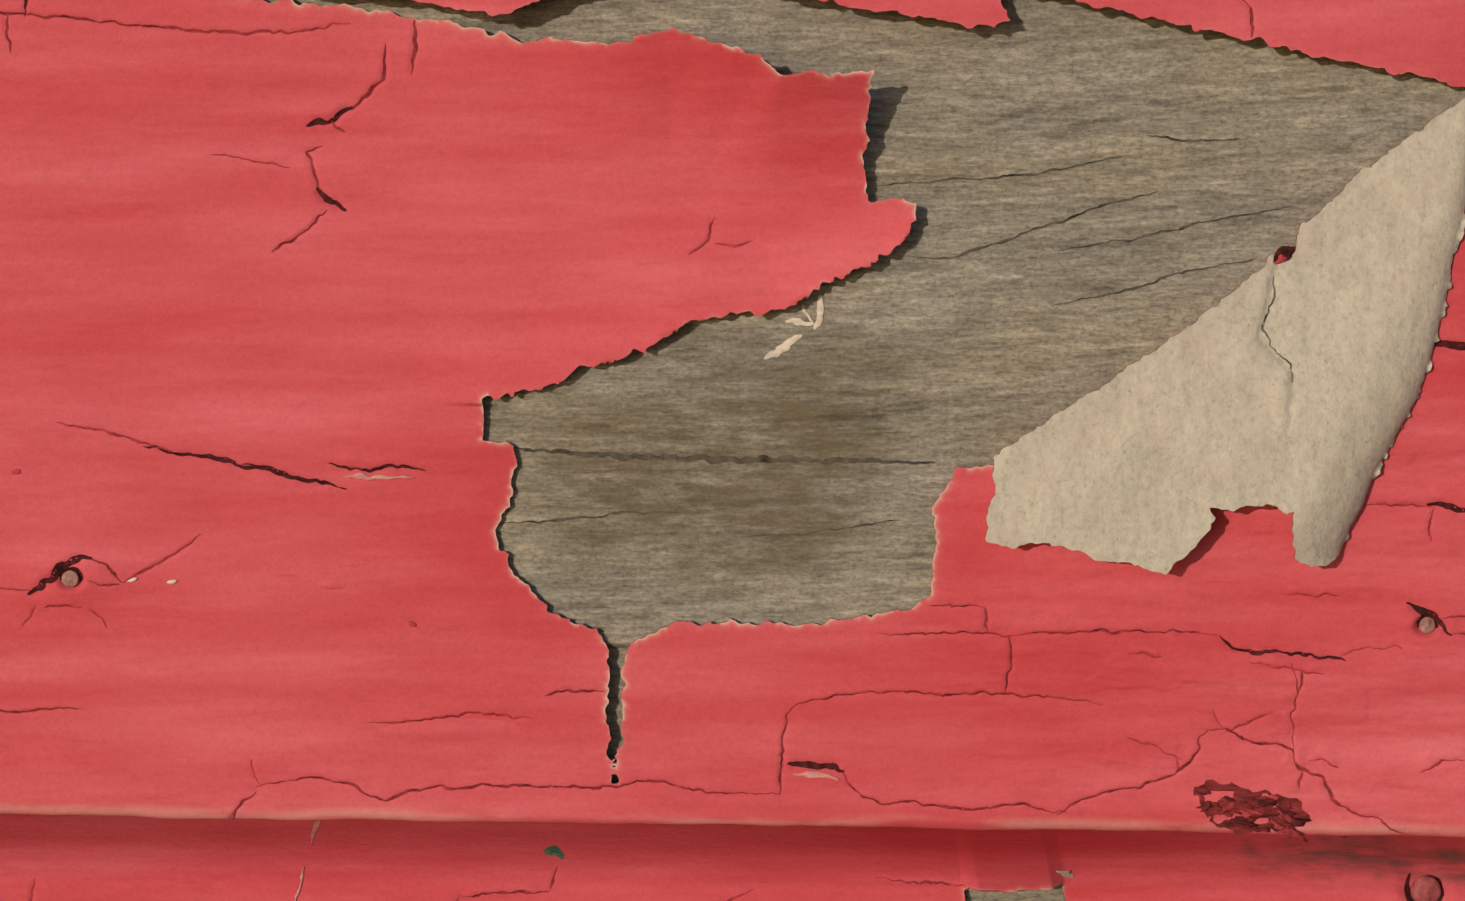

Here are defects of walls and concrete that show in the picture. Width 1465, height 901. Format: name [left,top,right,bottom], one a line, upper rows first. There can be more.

crack [0,0,349,50]
crack [210,20,418,253]
peeling [264,0,1465,784]
crack [57,422,426,490]
crack [0,533,201,627]
crack [1284,591,1340,599]
crack [1406,602,1465,636]
crack [0,706,77,714]
crack [226,604,1407,837]
crack [1420,759,1464,773]
spalling [1193,780,1311,843]
peeling [964,871,1077,901]